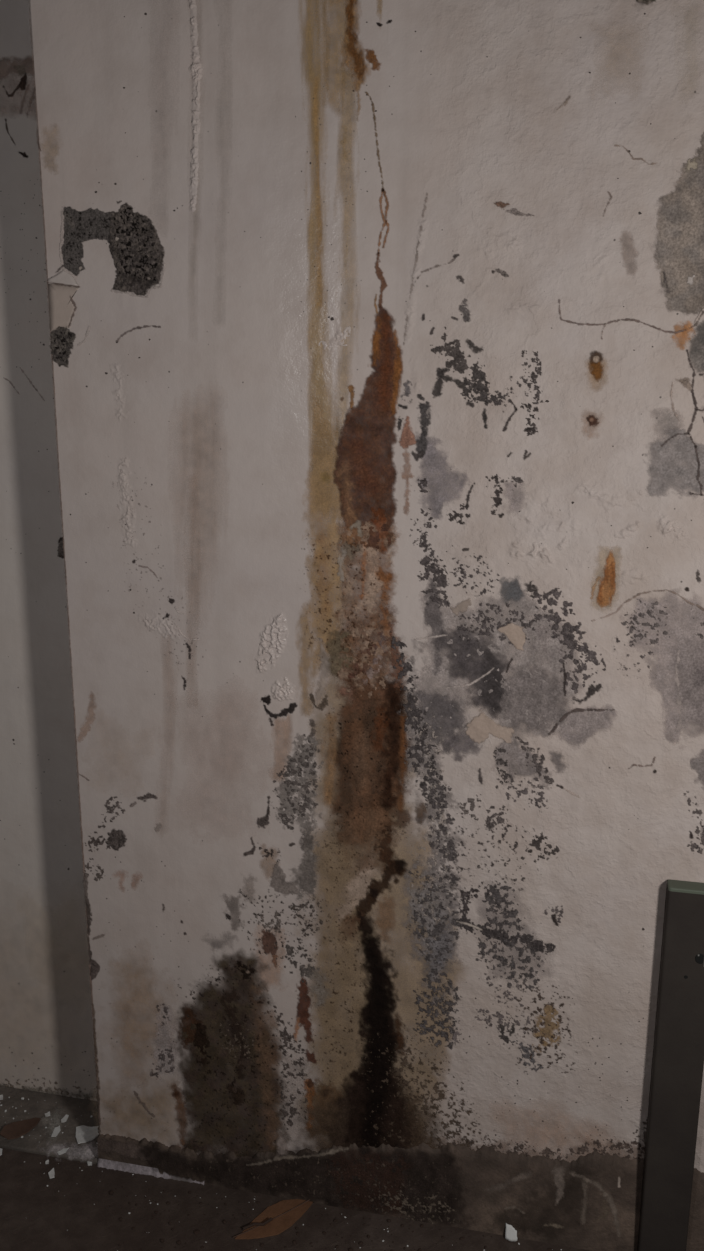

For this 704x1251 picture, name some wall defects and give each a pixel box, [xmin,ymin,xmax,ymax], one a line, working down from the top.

flaking render [20,201,165,378]
crack [365,92,464,344]
corrosion [589,351,603,381]
crack [559,300,704,496]
flaking render [647,411,704,496]
flaking render [654,134,704,390]
corrosion [294,0,504,1152]
peeling [391,299,616,1118]
corrosion [591,549,619,607]
peeling [617,571,704,741]
peeling [684,750,704,854]
leakage [0,954,647,1236]